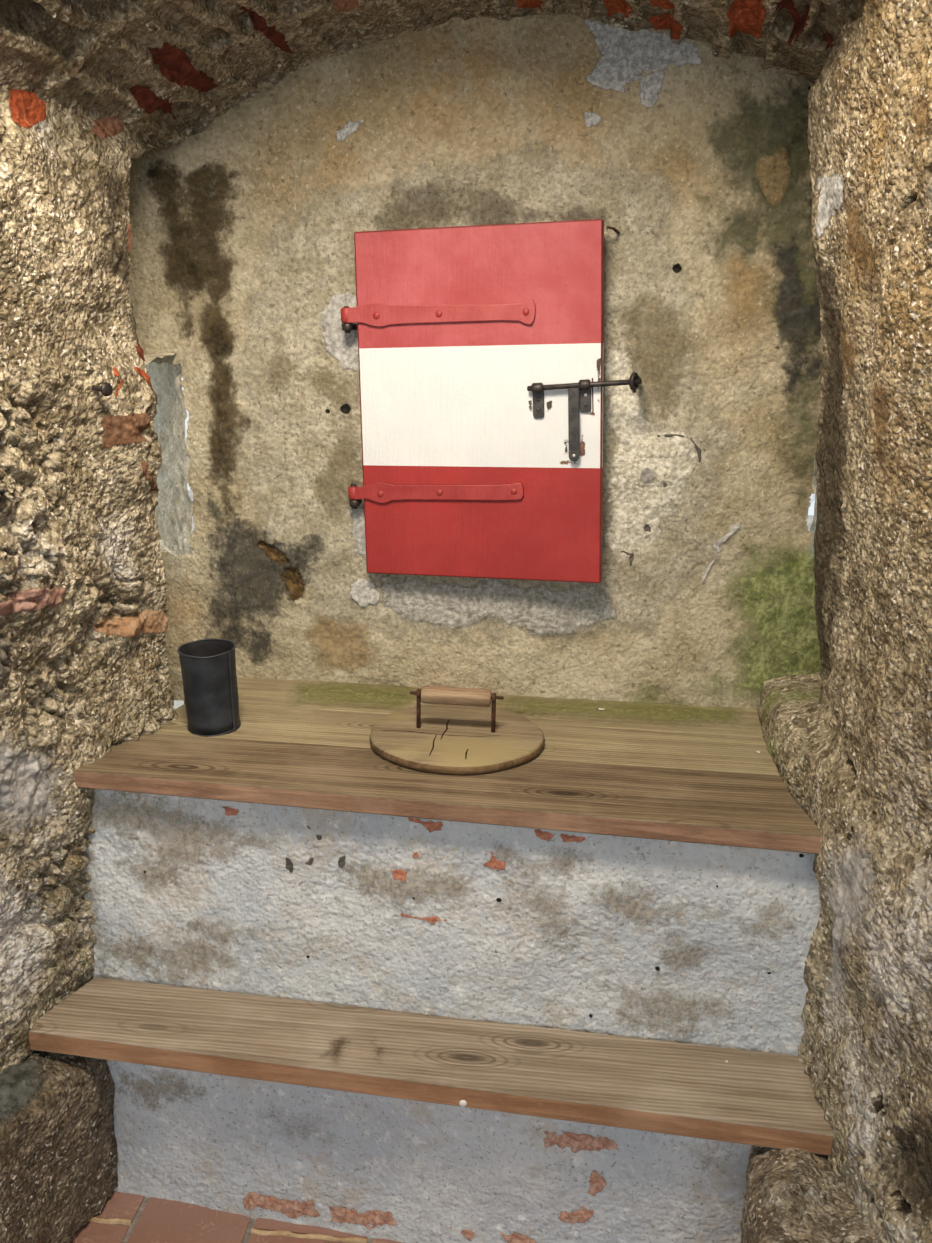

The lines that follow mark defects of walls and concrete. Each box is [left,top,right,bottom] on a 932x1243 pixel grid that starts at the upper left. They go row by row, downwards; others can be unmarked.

flaking render [149,42,220,93]
flaking render [240,6,294,54]
peeling [585,0,702,108]
flaking render [726,0,810,46]
flaking render [9,89,46,129]
flaking render [127,85,176,120]
peeling [334,120,364,142]
damp [106,174,128,282]
damp [147,160,321,664]
flaking render [544,1131,619,1153]
flaking render [243,1192,397,1229]
flaking render [559,1171,607,1224]